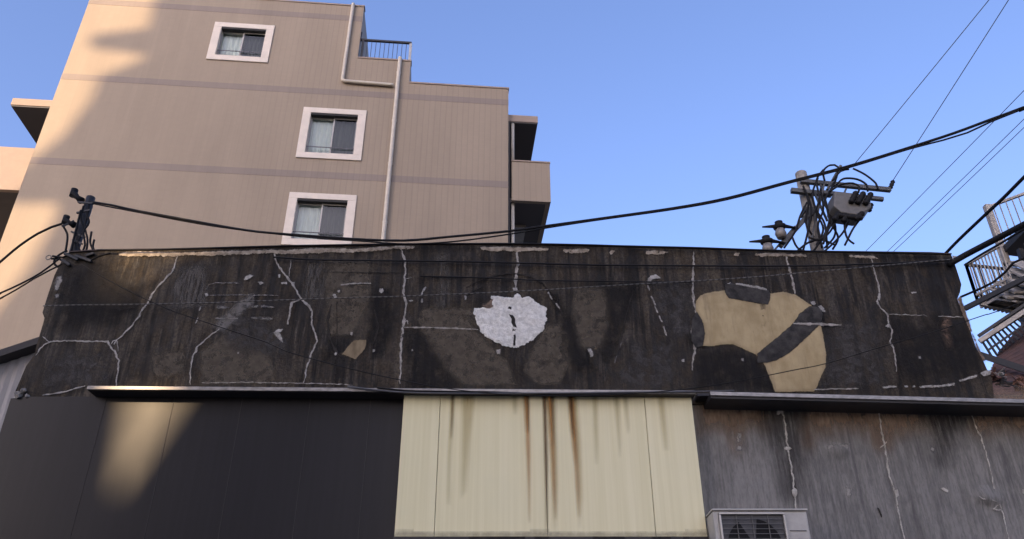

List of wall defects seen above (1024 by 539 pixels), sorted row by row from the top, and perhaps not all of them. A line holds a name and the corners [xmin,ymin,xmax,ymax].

water stain [55,264,137,324]
crack [36,256,178,386]
crack [189,329,219,384]
crack [273,254,318,383]
water stain [407,332,456,388]
crack [399,249,478,384]
crack [689,252,697,370]
crack [871,259,959,372]
water stain [893,320,978,377]
corrosion [543,396,553,493]
crack [777,411,797,509]
crack [878,413,905,539]